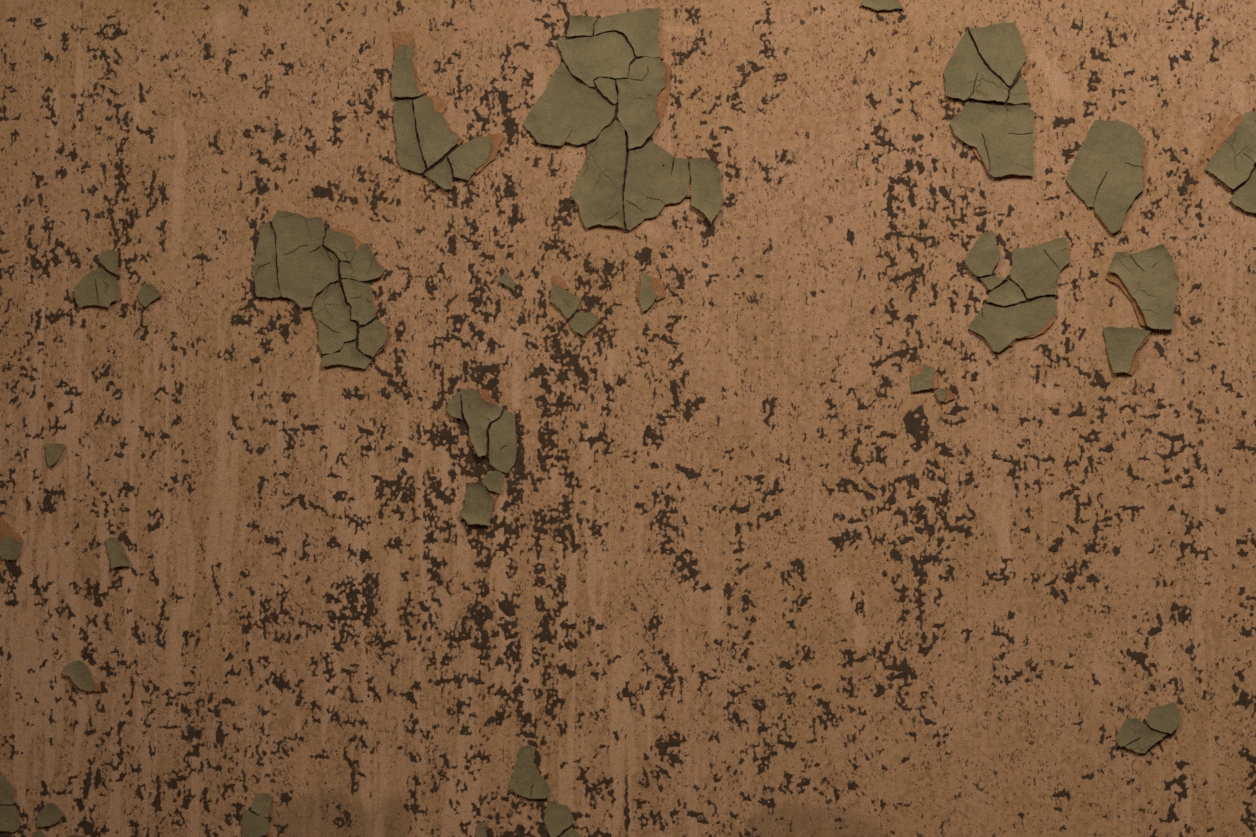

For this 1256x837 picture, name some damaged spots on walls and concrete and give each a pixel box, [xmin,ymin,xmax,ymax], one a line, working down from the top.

peeling [1205,107,1256,213]
peeling [0,0,886,837]
peeling [819,0,1226,754]
peeling [1178,348,1249,397]
peeling [1148,504,1256,565]
peeling [1226,587,1256,641]
peeling [1099,602,1215,837]
peeling [1228,657,1256,717]
peeling [1051,781,1071,829]
peeling [1238,748,1256,837]